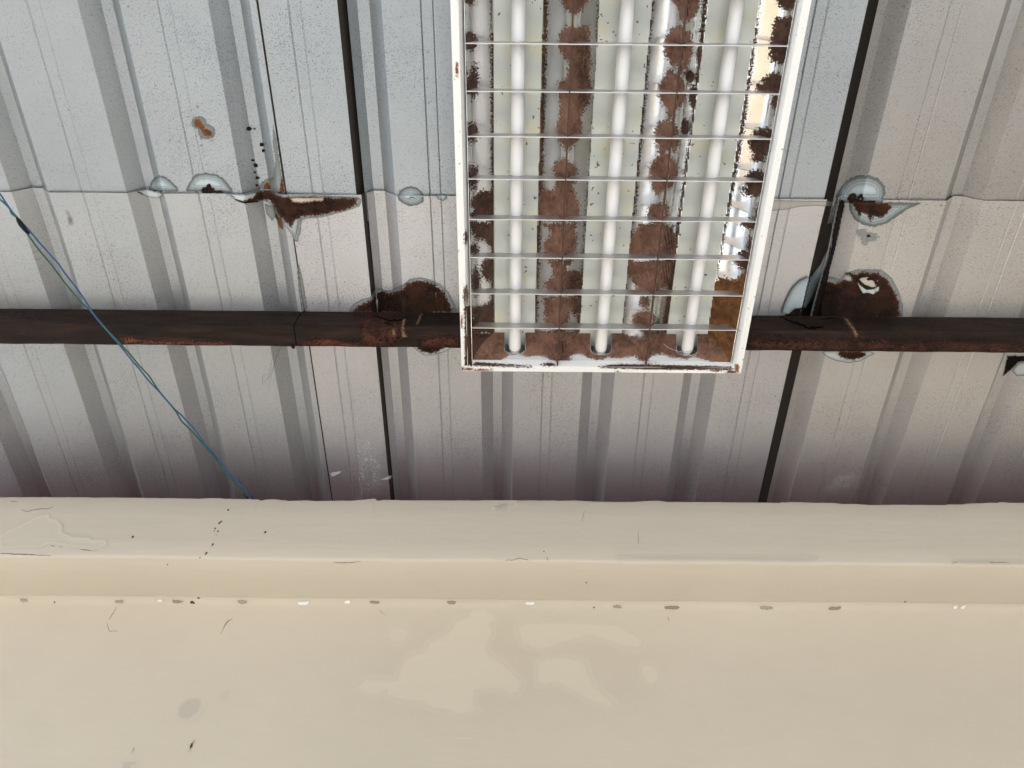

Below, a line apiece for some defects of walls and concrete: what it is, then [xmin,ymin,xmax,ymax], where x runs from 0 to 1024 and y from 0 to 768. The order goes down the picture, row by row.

corrosion [191,105,215,147]
corrosion [243,127,361,242]
corrosion [299,0,1024,376]
corrosion [120,335,233,345]
water stain [338,602,679,735]